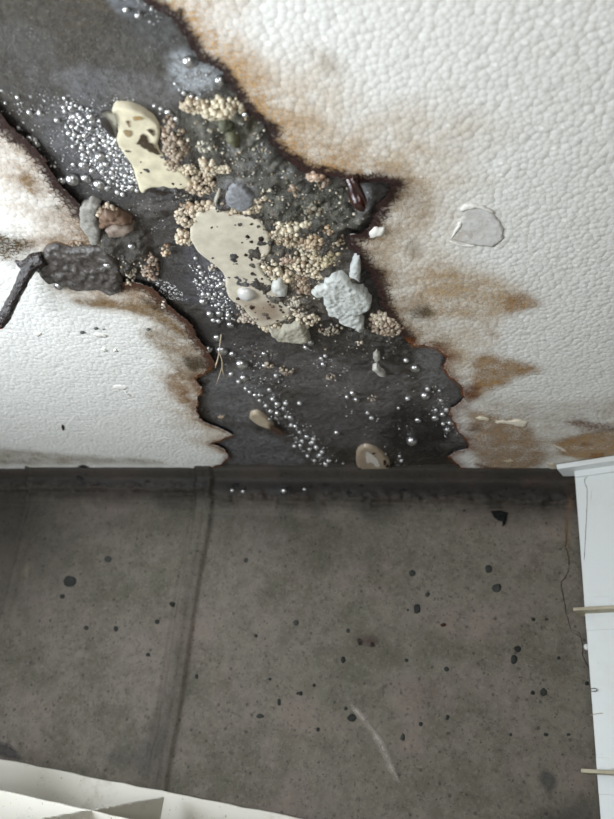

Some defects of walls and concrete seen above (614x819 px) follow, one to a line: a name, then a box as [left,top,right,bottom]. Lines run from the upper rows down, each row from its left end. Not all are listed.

water stain [0,234,36,260]
water stain [0,113,90,243]
water stain [143,0,466,370]
spalling [449,203,504,247]
water stain [77,282,226,449]